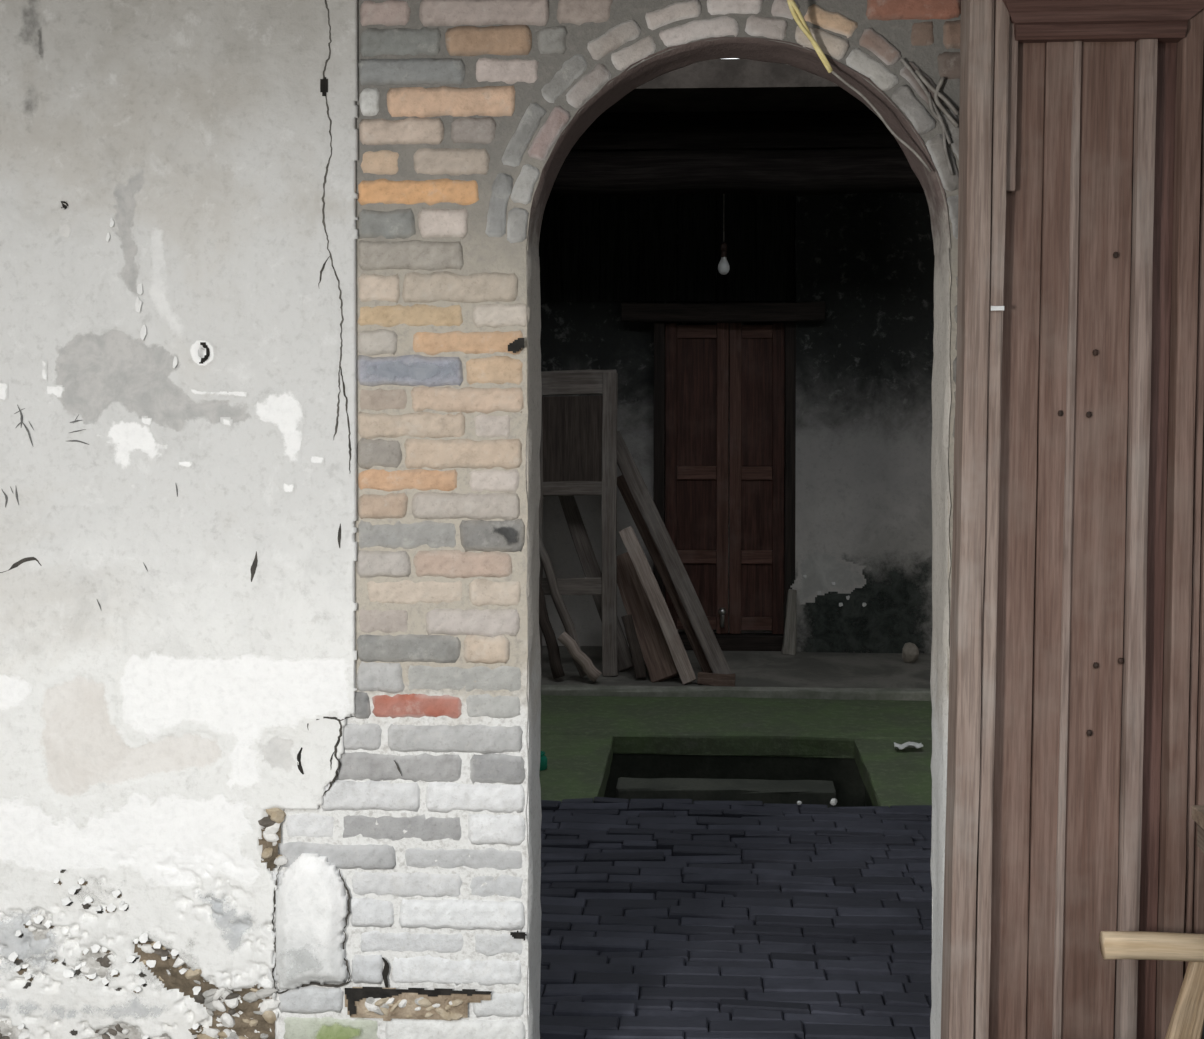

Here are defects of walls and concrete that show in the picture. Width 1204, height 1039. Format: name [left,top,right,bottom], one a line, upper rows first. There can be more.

crack [318,0,352,472]
peeling [31,673,225,808]
peeling [261,734,299,779]
crack [297,716,356,796]
spalling [258,808,288,871]
peeling [54,869,128,914]
spalling [0,1019,26,1039]
peeling [8,910,54,989]
spalling [51,933,281,1039]
spalling [345,987,492,1021]